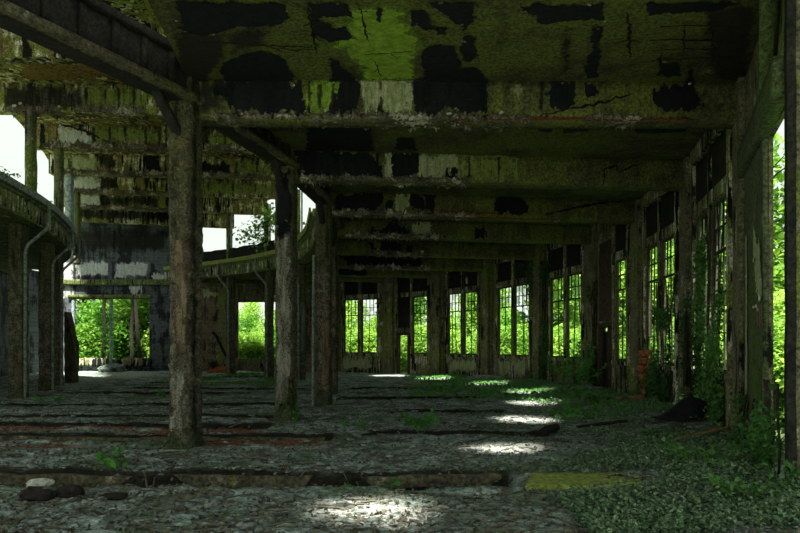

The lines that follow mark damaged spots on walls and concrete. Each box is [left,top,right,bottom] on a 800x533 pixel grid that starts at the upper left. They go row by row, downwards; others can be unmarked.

crack [358,8,412,80]
water stain [3,84,107,110]
water stain [361,80,413,115]
crack [540,94,631,116]
water stain [57,125,111,145]
peeling [211,2,706,403]